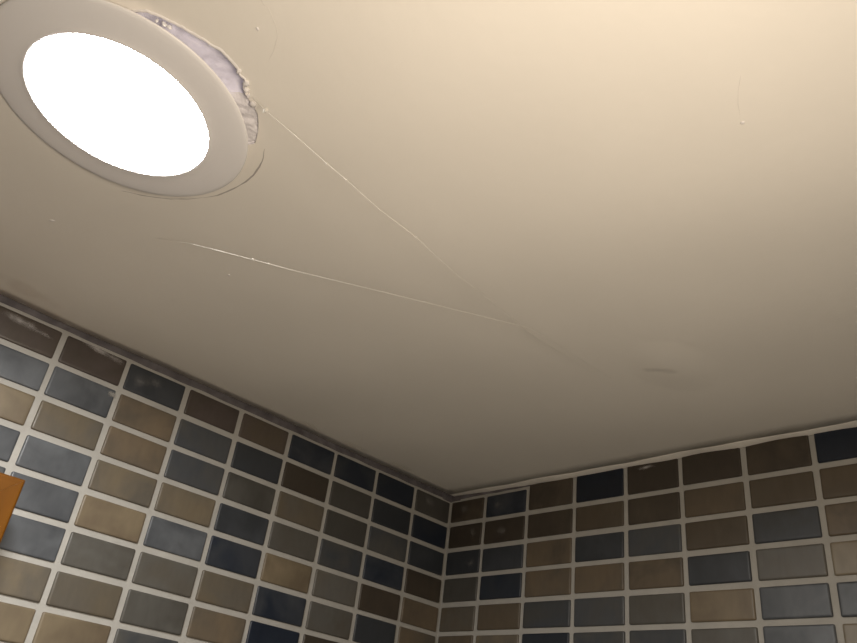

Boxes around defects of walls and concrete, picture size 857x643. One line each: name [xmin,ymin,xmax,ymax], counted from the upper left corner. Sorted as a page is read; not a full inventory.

crack [192,149,265,199]